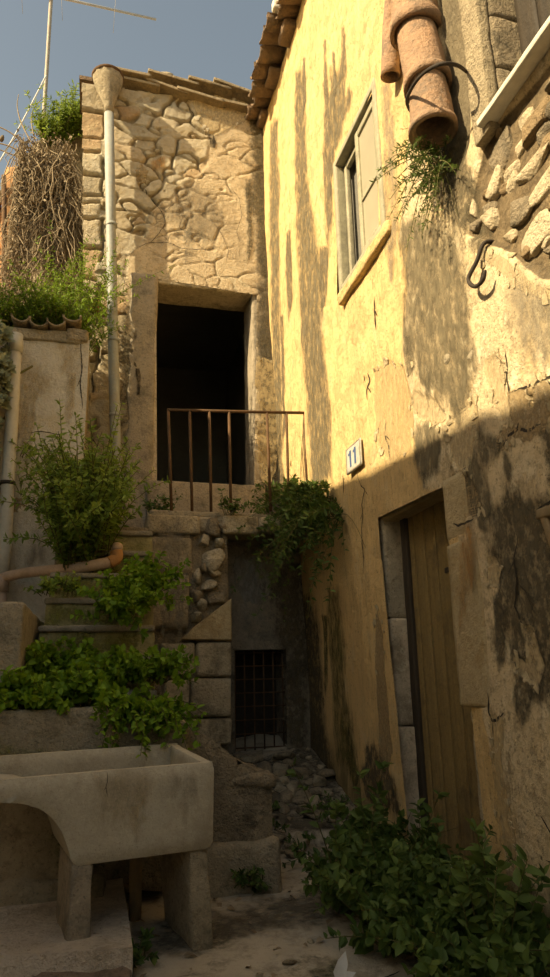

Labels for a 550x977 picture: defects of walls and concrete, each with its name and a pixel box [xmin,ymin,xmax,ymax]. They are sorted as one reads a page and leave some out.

peeling [188,94,250,148]
crack [137,189,246,261]
water stain [245,28,351,497]
water stain [383,87,491,426]
peeling [479,248,550,305]
crack [505,353,550,401]
water stain [414,424,441,485]
water stain [463,427,550,725]